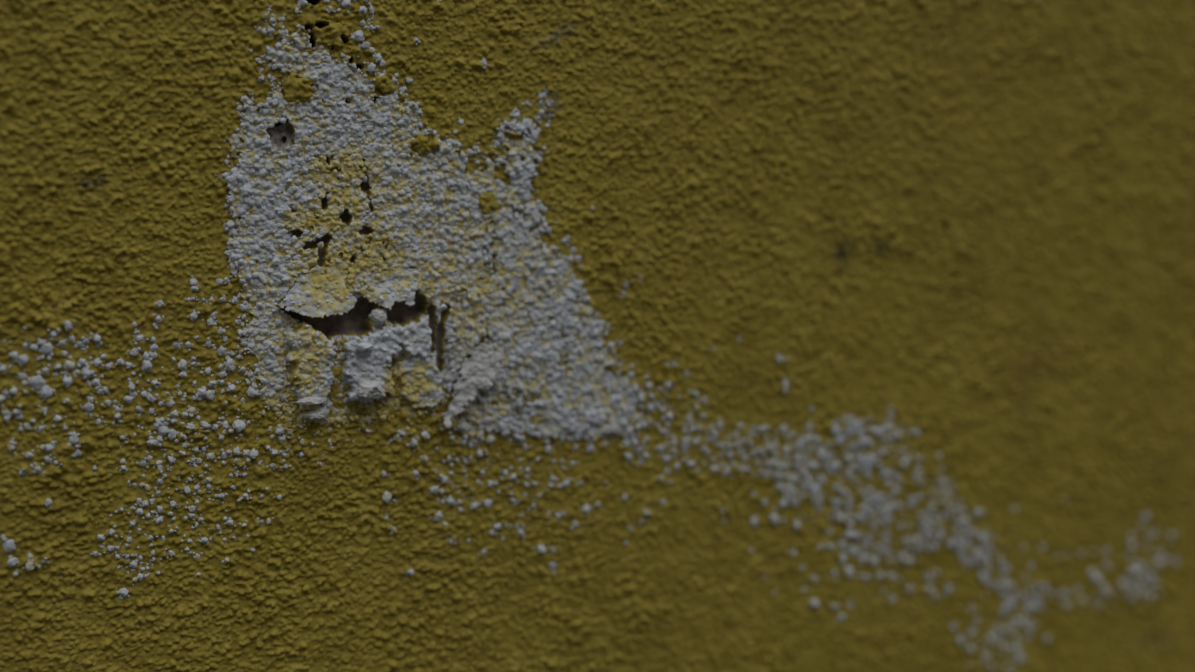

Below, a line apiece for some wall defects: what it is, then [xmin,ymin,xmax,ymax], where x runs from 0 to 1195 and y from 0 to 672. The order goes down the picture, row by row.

spalling [304,22,325,47]
spalling [340,210,371,234]
leakage [153,300,165,330]
spalling [277,230,505,429]
leakage [172,0,1085,672]
leakage [0,320,304,586]
leakage [116,588,130,600]